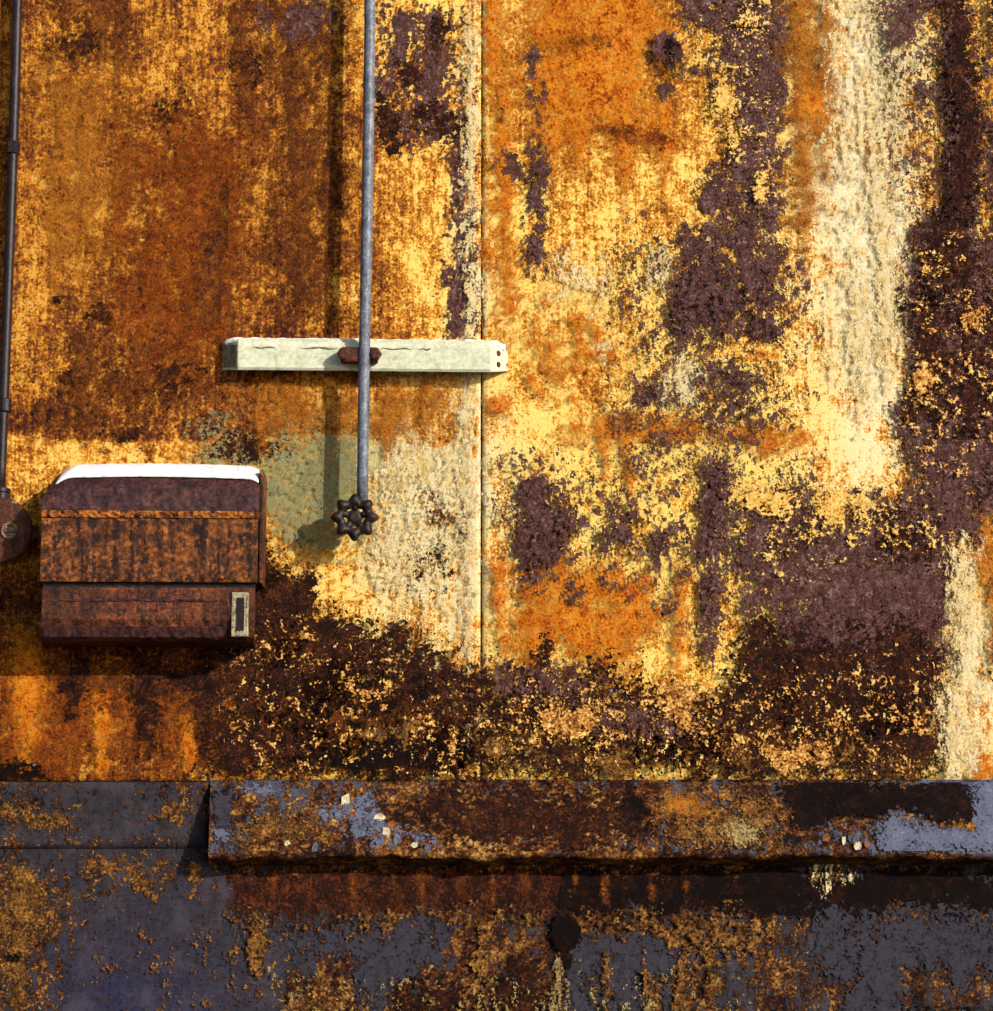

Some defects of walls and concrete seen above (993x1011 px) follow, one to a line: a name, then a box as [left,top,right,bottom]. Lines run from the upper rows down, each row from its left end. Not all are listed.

corrosion [935,0,993,224]
corrosion [0,0,456,463]
corrosion [472,0,817,497]
corrosion [404,488,472,599]
corrosion [972,506,993,619]
corrosion [219,865,993,1011]